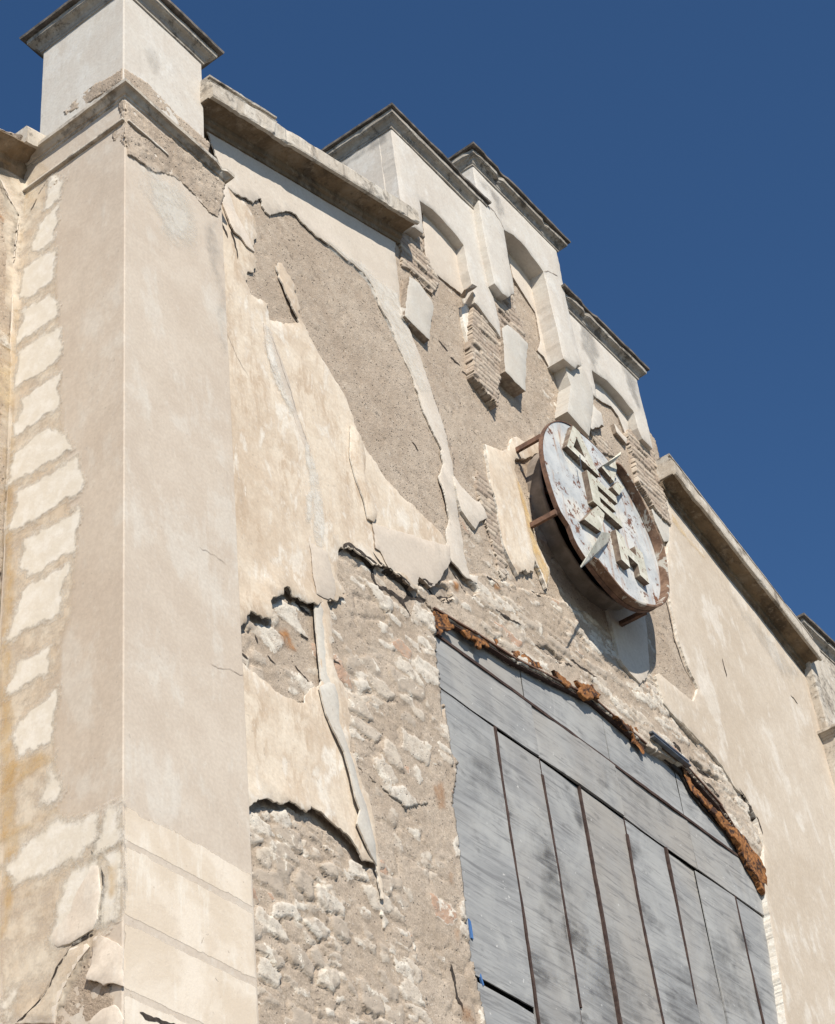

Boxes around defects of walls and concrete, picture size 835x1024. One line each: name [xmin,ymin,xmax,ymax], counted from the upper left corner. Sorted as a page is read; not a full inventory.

flaking render [63,68,210,152]
peeling [0,164,763,1024]
corrosion [432,611,498,650]
corrosion [511,651,601,701]
corrosion [611,716,644,754]
corrosion [681,767,768,895]
crack [19,840,105,1020]